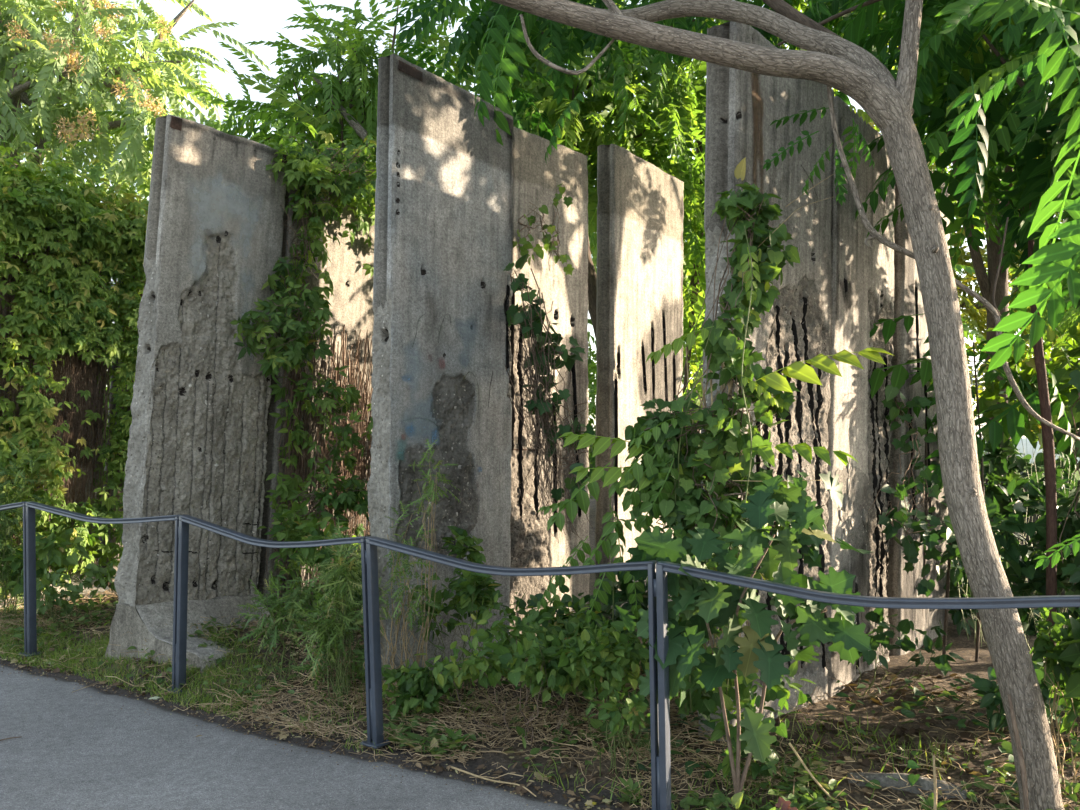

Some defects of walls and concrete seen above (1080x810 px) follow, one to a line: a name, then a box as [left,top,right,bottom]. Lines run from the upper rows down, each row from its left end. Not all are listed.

damp [831,160,852,316]
spalling [114,230,272,608]
damp [556,336,588,429]
damp [640,300,683,413]
damp [905,228,917,541]
damp [903,553,917,635]